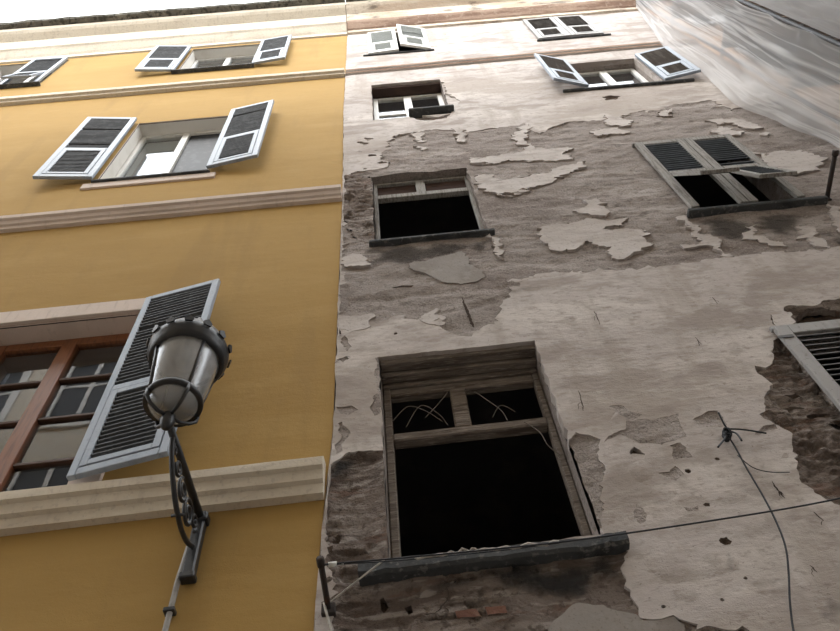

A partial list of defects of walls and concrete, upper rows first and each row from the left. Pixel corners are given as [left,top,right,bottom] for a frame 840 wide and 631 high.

flaking render [338,83,840,362]
leakage [712,221,748,238]
spalling [755,338,840,505]
spalling [321,406,647,631]
leakage [492,558,614,594]
spalling [678,620,722,631]